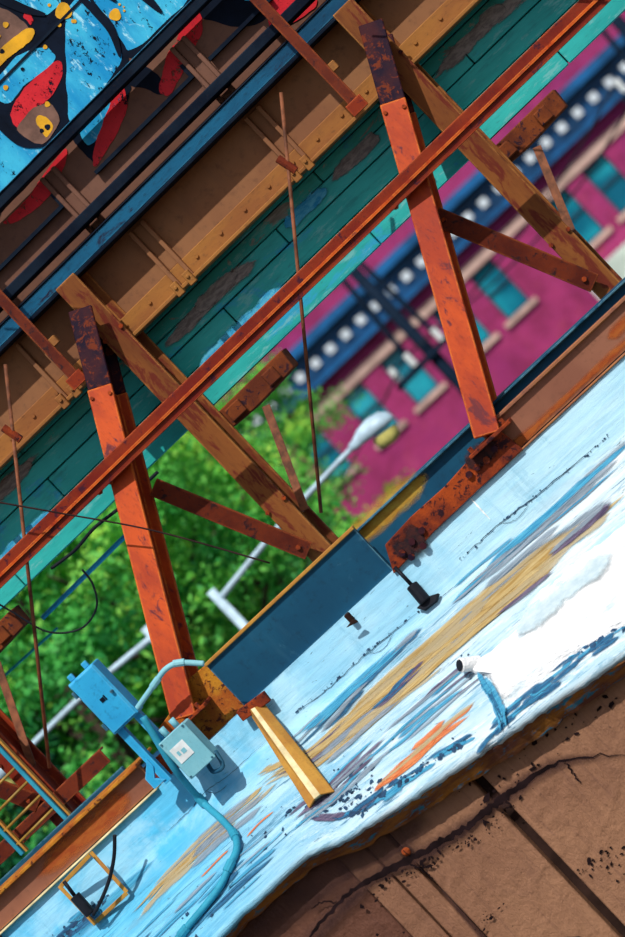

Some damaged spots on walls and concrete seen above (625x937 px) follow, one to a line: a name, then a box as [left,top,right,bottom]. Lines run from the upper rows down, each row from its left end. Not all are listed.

peeling [435,0,525,79]
peeling [284,132,380,228]
peeling [165,260,256,346]
rust [465,440,498,469]
rust [353,475,425,539]
rust [392,524,428,559]
crack [169,751,255,830]
rust [42,793,127,873]
crack [305,753,622,937]